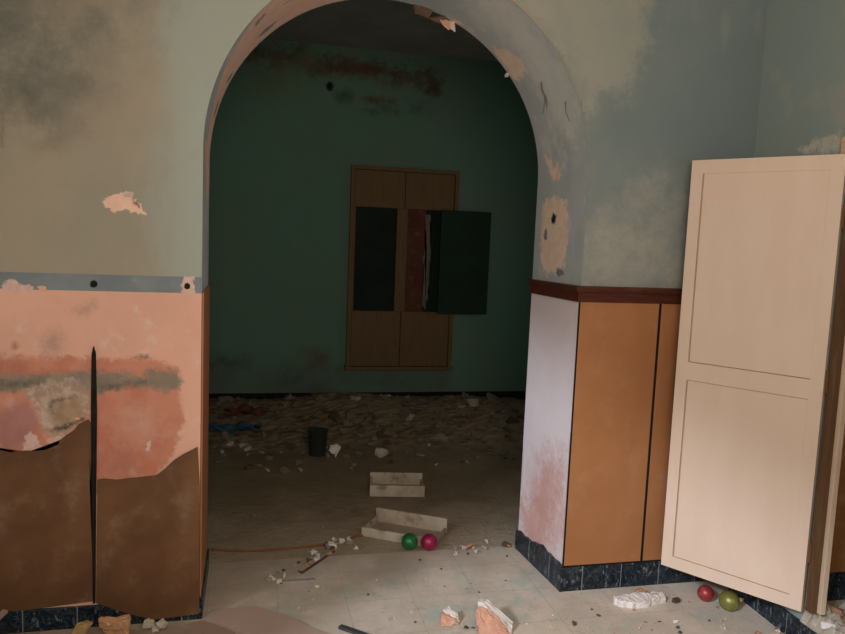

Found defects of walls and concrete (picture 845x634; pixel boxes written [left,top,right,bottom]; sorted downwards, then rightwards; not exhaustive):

peeling [19,0,345,223]
leakage [228,38,460,123]
peeling [394,0,714,288]
peeling [0,274,47,297]
peeling [176,271,200,299]
leakage [69,342,198,510]